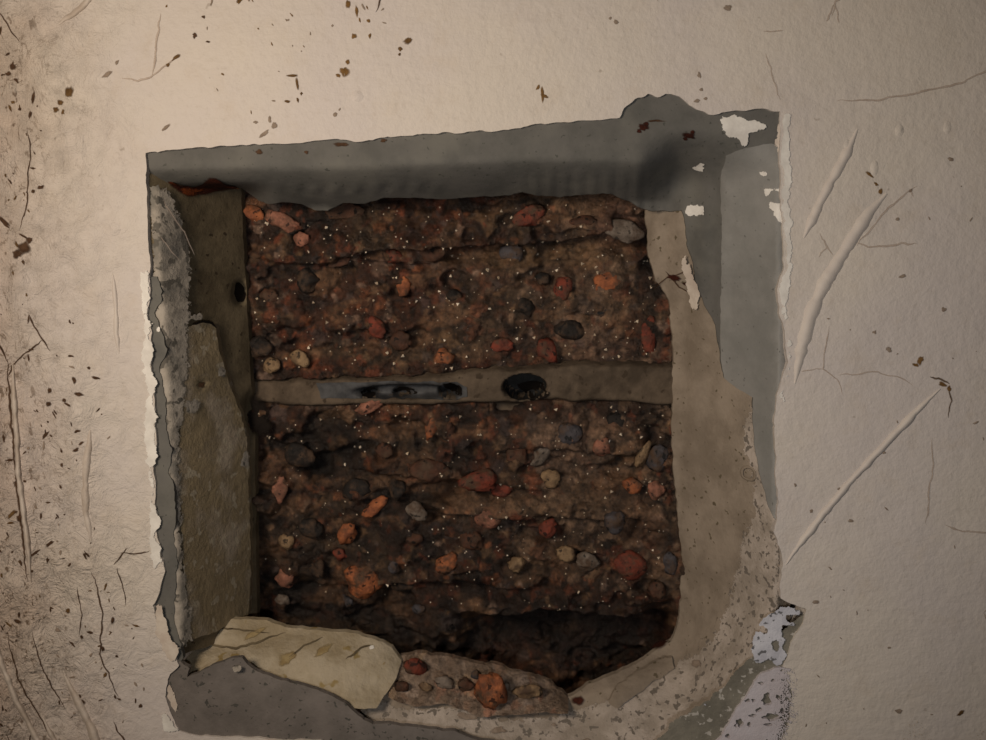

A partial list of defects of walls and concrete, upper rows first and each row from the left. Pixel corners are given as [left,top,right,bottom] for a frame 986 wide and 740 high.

crack [838,71,986,101]
crack [20,133,31,227]
crack [857,186,917,248]
crack [0,315,50,580]
spalling [140,72,804,740]
crack [801,331,952,418]
crack [925,445,986,533]
crack [77,548,149,696]
crack [7,633,65,740]